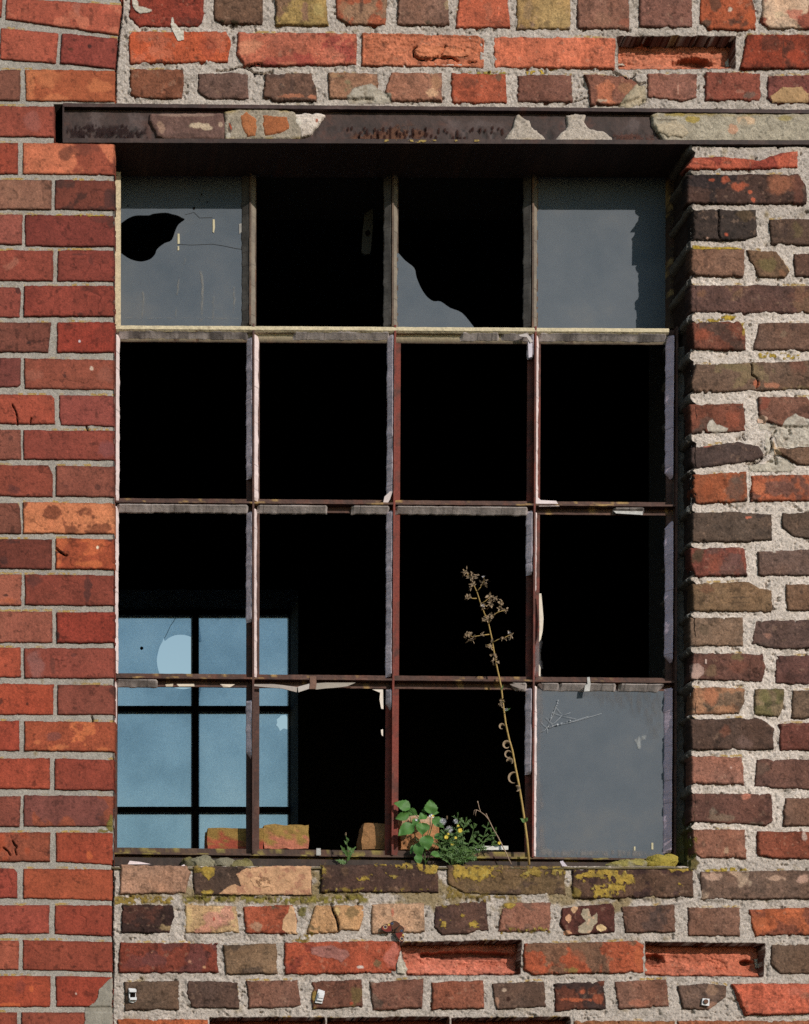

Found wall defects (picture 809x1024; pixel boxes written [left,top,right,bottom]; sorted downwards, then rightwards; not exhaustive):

rust [67,124,148,138]
spalling [229,112,289,137]
rust [347,126,504,139]
water stain [439,865,521,928]
water stain [520,866,635,899]
spalling [563,906,607,936]